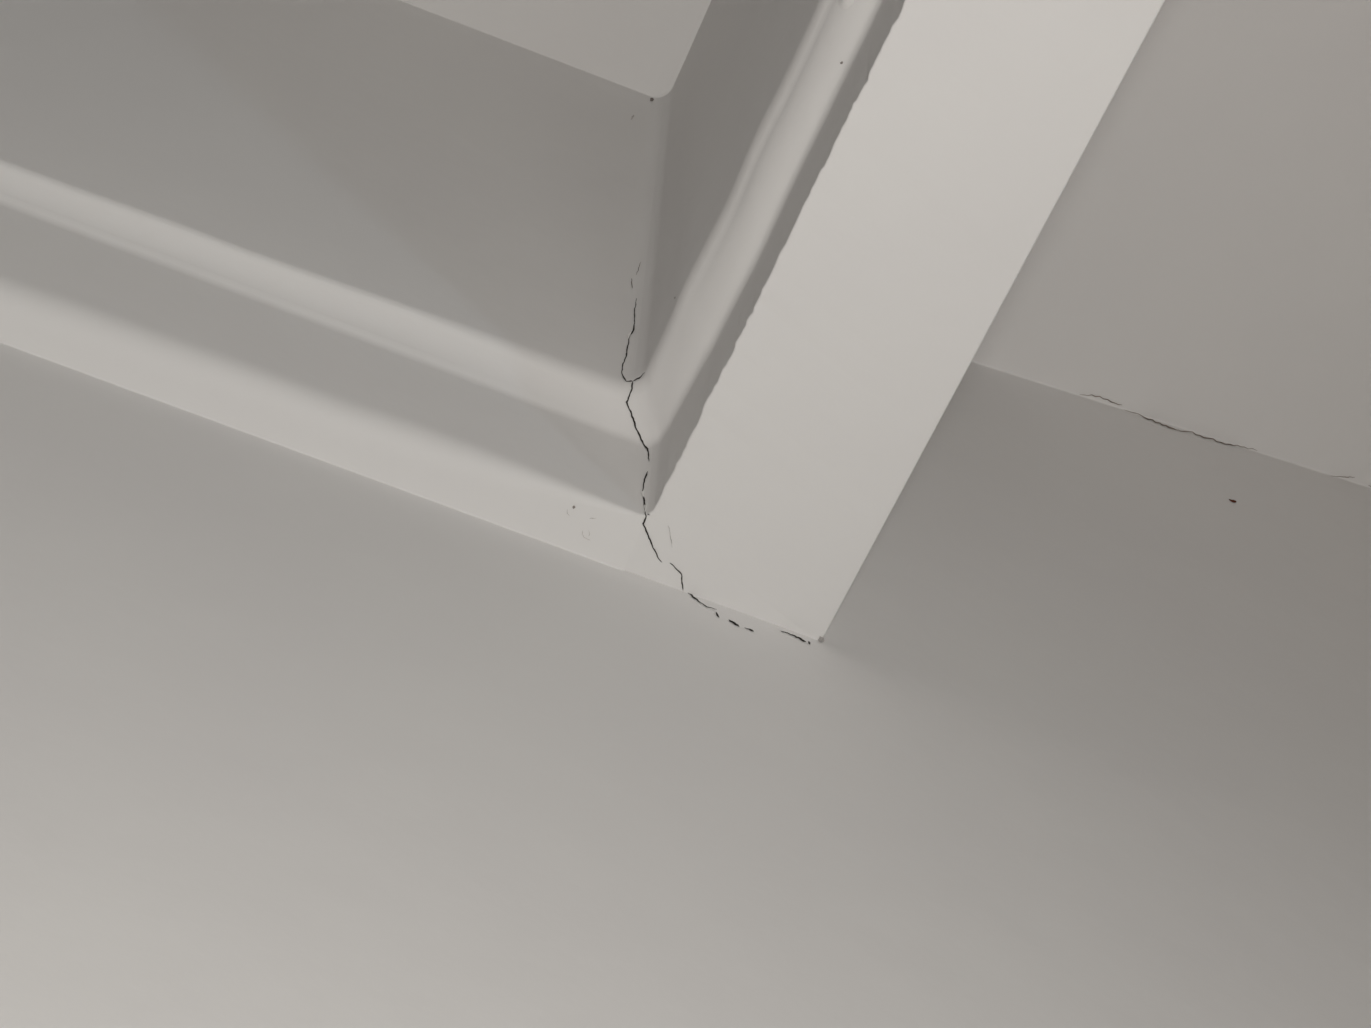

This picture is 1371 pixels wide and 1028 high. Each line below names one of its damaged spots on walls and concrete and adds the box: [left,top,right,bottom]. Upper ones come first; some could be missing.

crack [621,262,824,644]
crack [1086,394,1257,451]